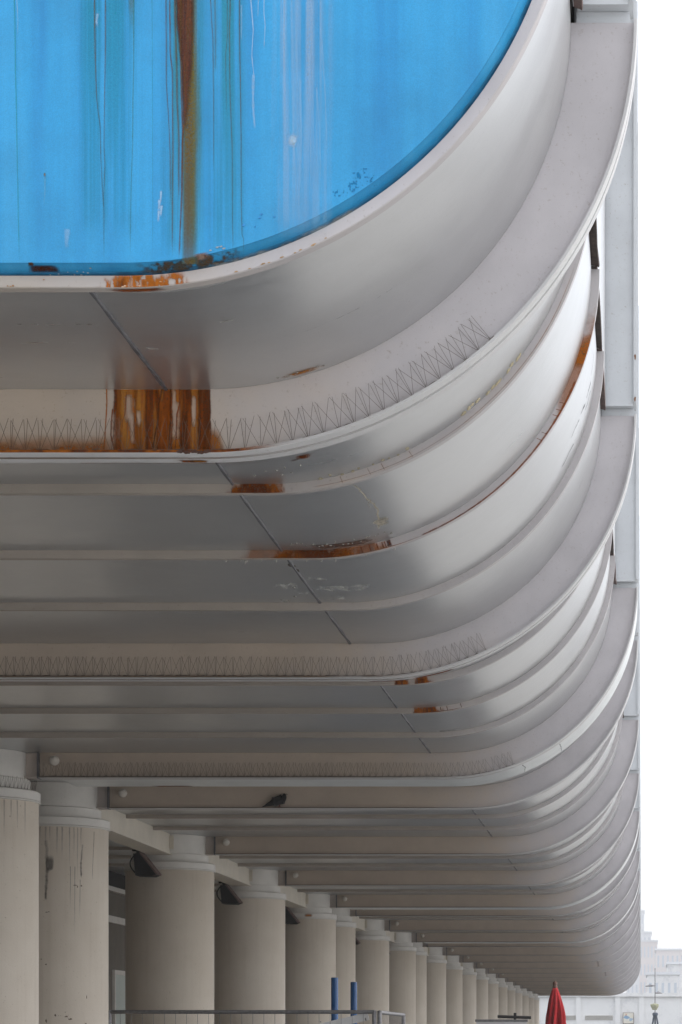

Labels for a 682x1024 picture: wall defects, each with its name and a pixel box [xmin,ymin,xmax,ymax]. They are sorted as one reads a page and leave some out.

corrosion [225,0,241,116]
corrosion [105,0,234,292]
corrosion [0,389,257,463]
corrosion [231,484,283,493]
corrosion [274,335,592,558]